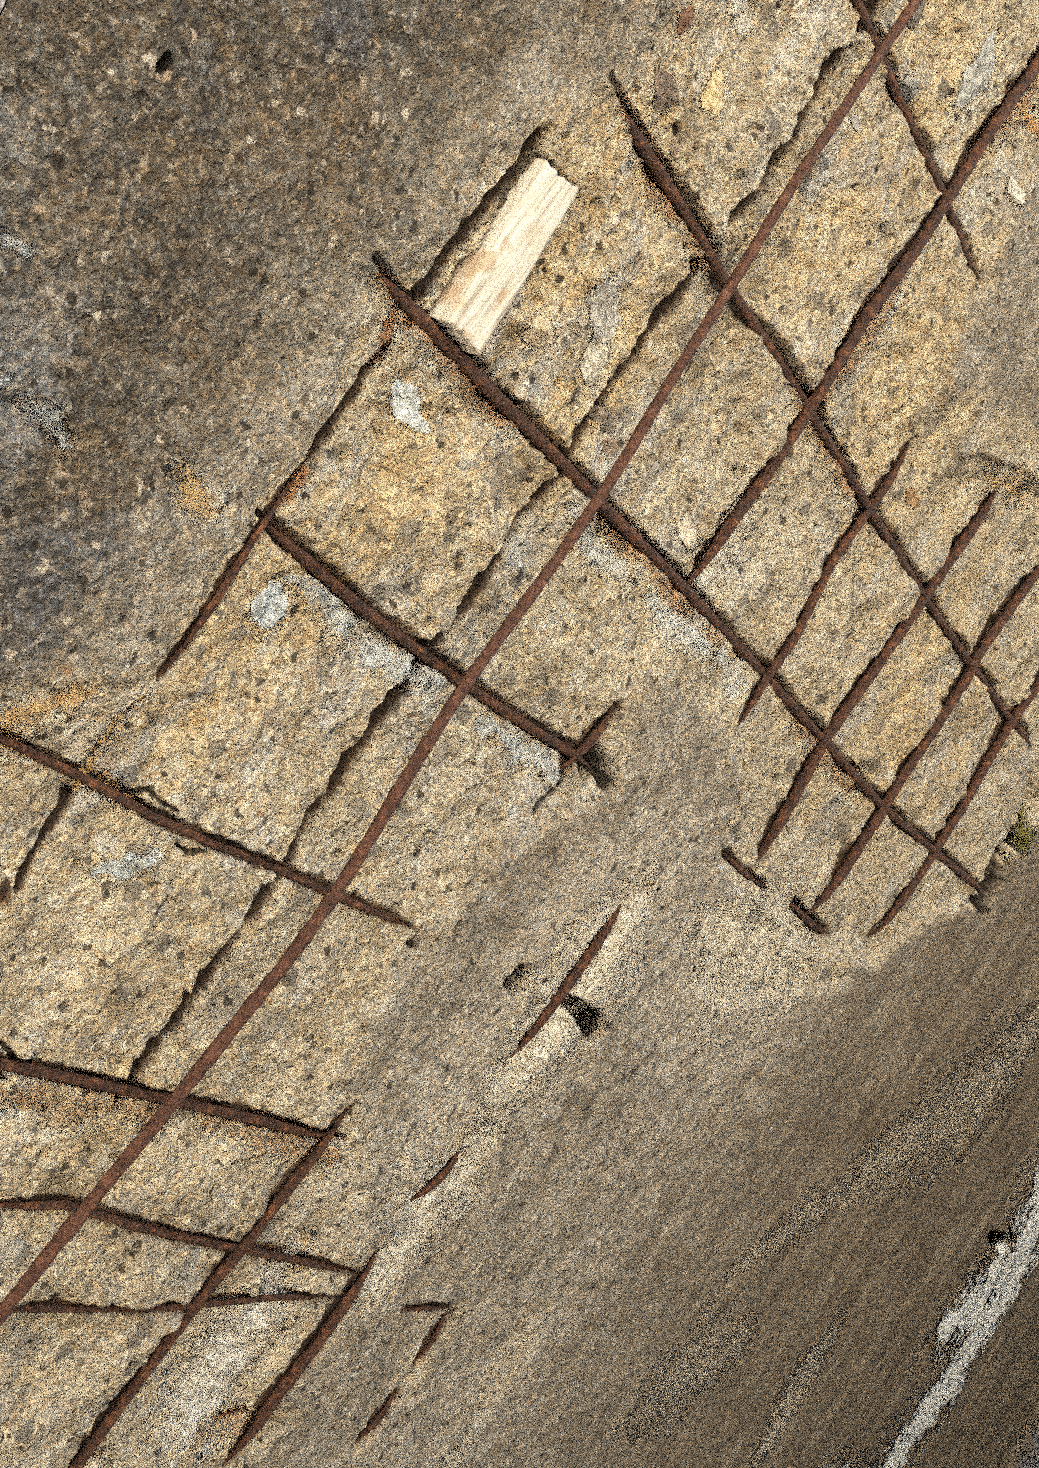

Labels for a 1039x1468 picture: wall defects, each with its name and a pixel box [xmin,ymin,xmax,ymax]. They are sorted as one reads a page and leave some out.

corrosion [74,696,145,786]
corrosion [283,452,309,502]
corrosion [371,310,396,359]
spalling [0,0,910,1303]
spalling [474,0,1039,1010]
spalling [0,694,606,1468]
damp [870,1158,1039,1468]